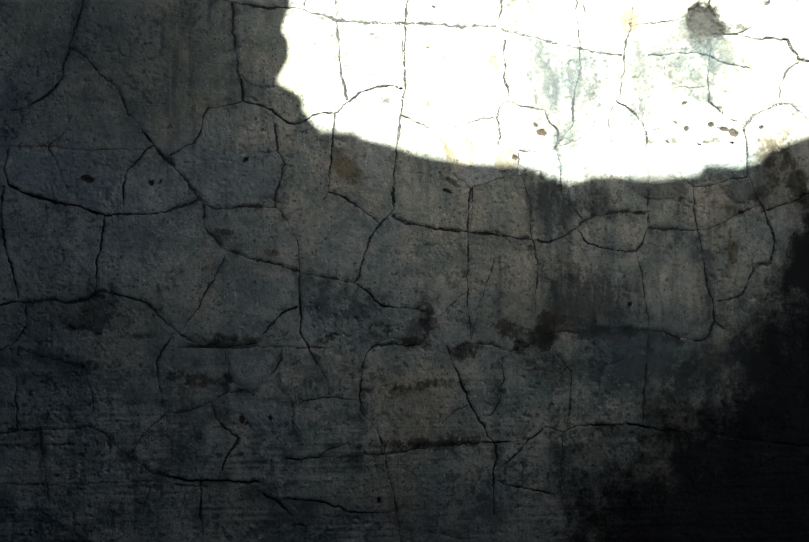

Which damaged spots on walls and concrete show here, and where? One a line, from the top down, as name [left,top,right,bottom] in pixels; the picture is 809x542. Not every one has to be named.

damp [685,1,747,43]
crack [0,0,809,422]
damp [749,129,808,210]
damp [491,309,572,353]
crack [0,337,258,525]
crack [263,493,286,509]
crack [287,338,433,542]
crack [442,345,660,515]